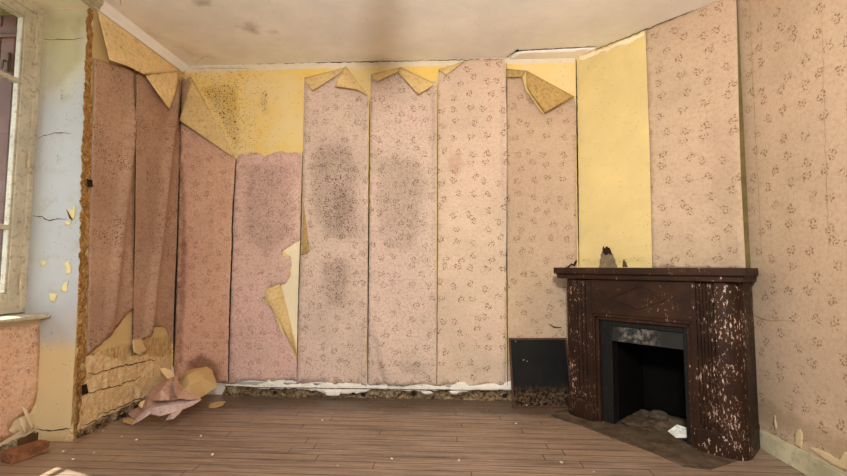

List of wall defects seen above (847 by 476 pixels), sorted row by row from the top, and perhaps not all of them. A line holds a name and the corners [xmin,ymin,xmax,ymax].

flaking render [579,32,644,61]
flaking render [49,8,172,442]
water stain [306,141,364,243]
flaking render [794,429,847,470]